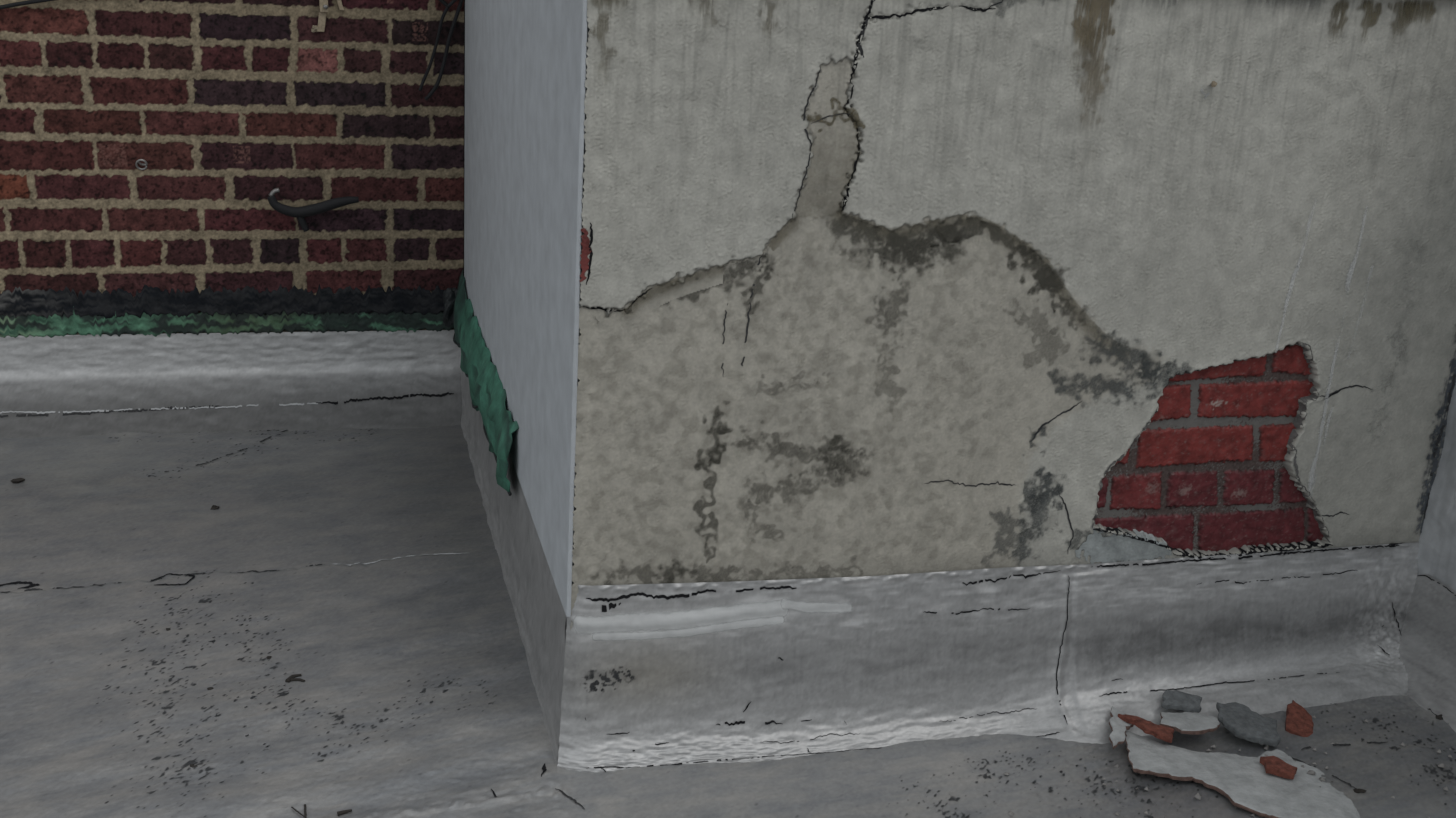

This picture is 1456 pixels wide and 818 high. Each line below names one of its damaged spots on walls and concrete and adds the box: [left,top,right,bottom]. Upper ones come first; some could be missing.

leakage [1332,0,1435,29]
crack [792,0,1003,219]
spalling [580,223,593,285]
leakage [694,407,731,582]
leakage [997,468,1063,560]
crack [924,340,1456,737]
spalling [1075,342,1333,564]
crack [586,586,797,612]
crack [541,702,884,809]
peeling [968,747,1218,818]
spalling [1118,714,1174,743]
peeling [1321,703,1456,786]